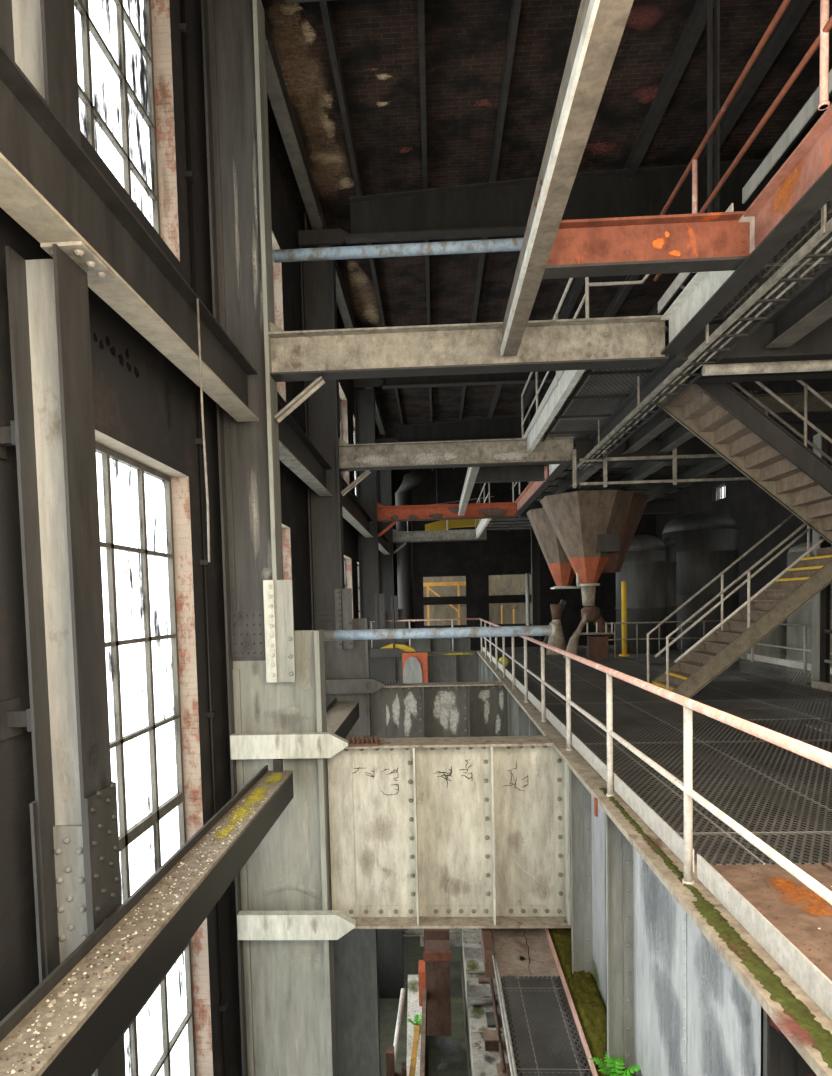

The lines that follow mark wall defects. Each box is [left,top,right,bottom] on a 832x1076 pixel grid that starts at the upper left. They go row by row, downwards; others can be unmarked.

rust [652,231,681,256]
leakage [386,692,417,736]
leakage [433,691,459,733]
leakage [478,690,504,733]